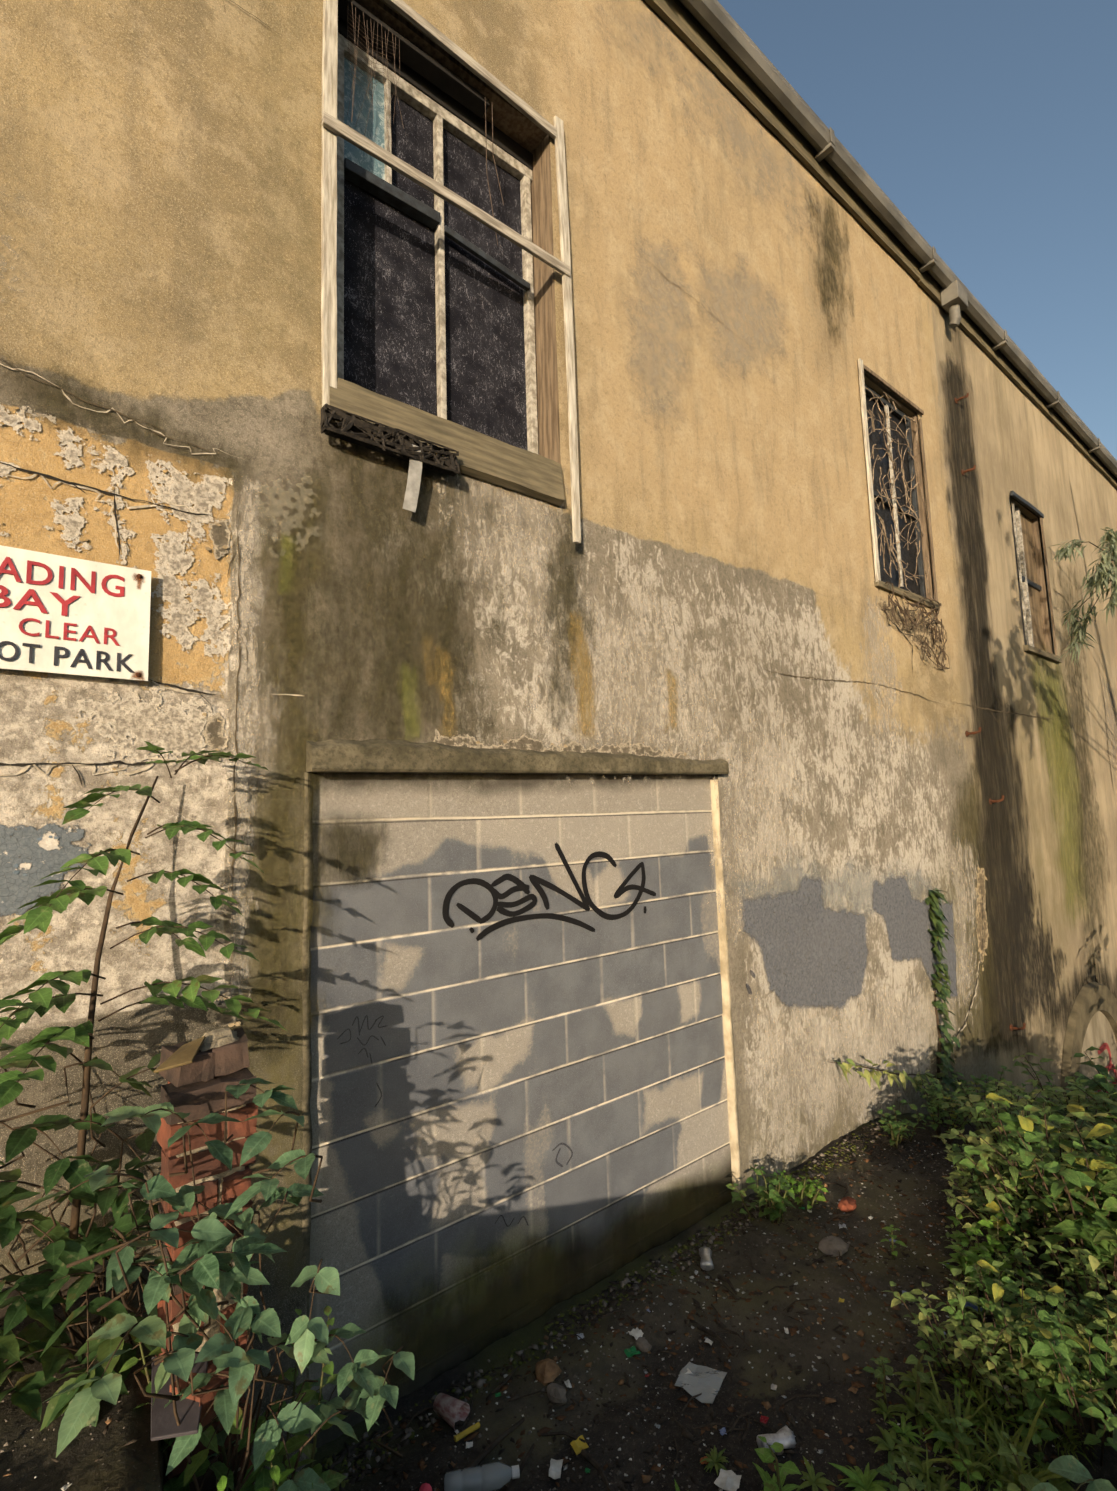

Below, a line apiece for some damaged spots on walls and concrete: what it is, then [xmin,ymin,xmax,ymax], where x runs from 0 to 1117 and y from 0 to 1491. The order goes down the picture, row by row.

leakage [810,199,848,305]
peeling [0,404,235,664]
peeling [13,863,32,876]
peeling [36,831,61,851]
crack [0,356,248,985]
peeling [75,685,230,770]
leakage [215,457,331,1054]
leakage [336,445,804,942]
leakage [746,360,1117,1160]
flaking render [206,995,241,1027]